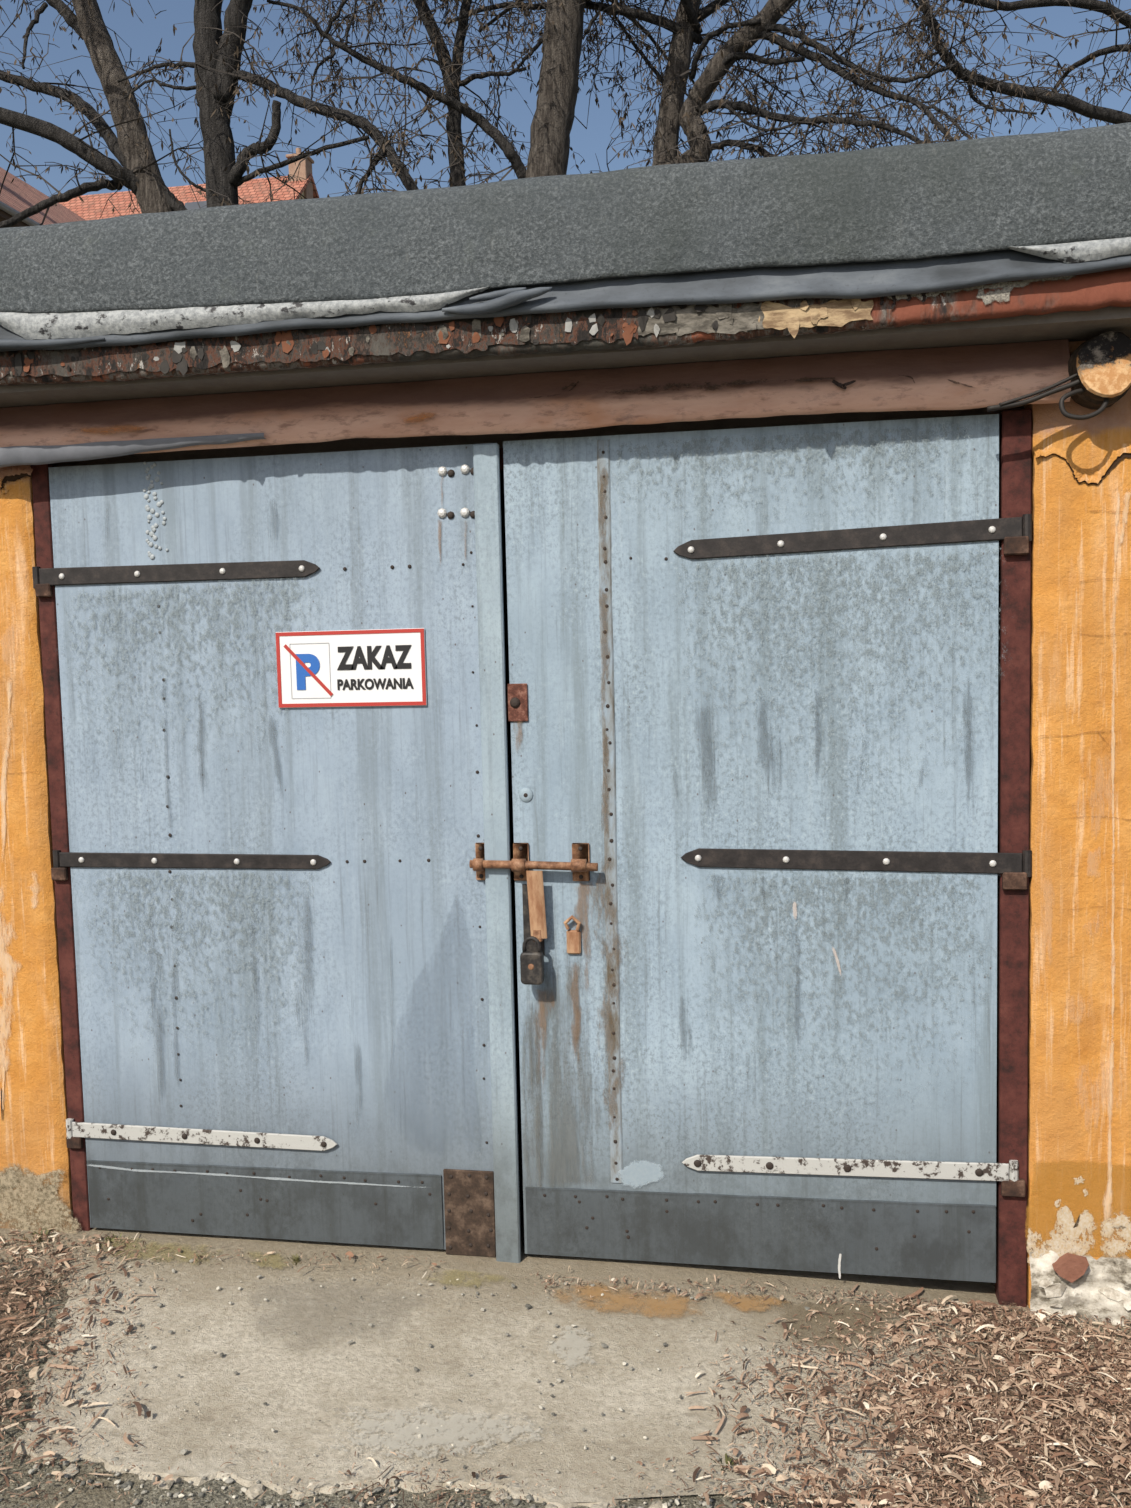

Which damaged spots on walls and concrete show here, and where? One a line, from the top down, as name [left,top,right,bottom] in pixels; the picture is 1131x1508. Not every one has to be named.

peeling [0,275,1077,379]
crack [1035,443,1131,485]
flaking render [0,1163,80,1234]
spalling [1027,1176,1131,1326]